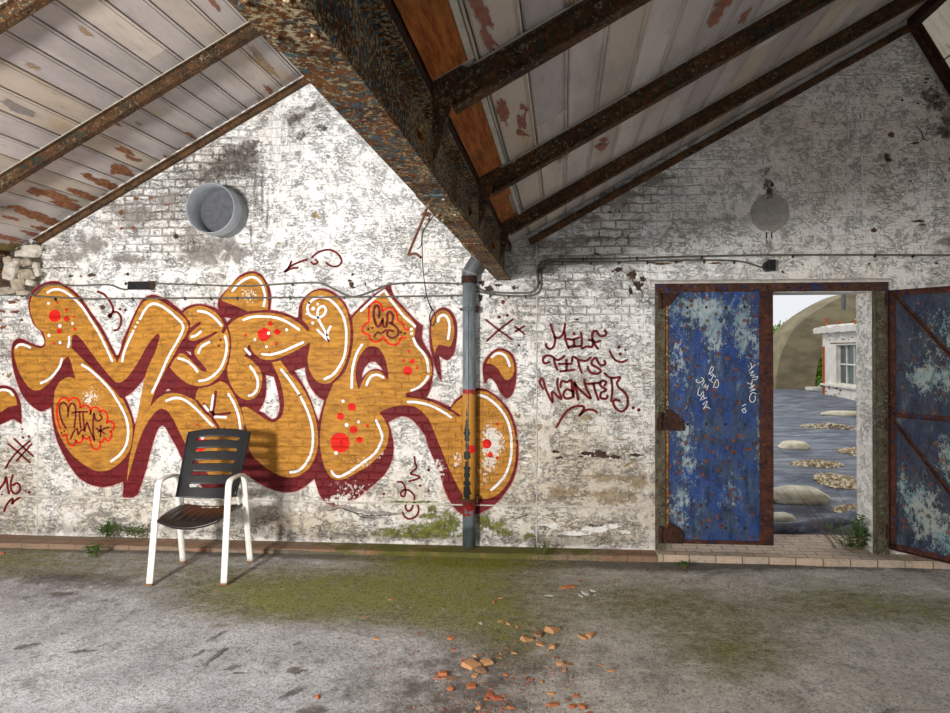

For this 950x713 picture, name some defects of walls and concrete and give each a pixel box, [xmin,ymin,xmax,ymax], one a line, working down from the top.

peeling [469,0,499,53]
peeling [27,146,142,211]
water stain [195,103,327,227]
spalling [0,205,60,330]
spalling [576,438,644,467]